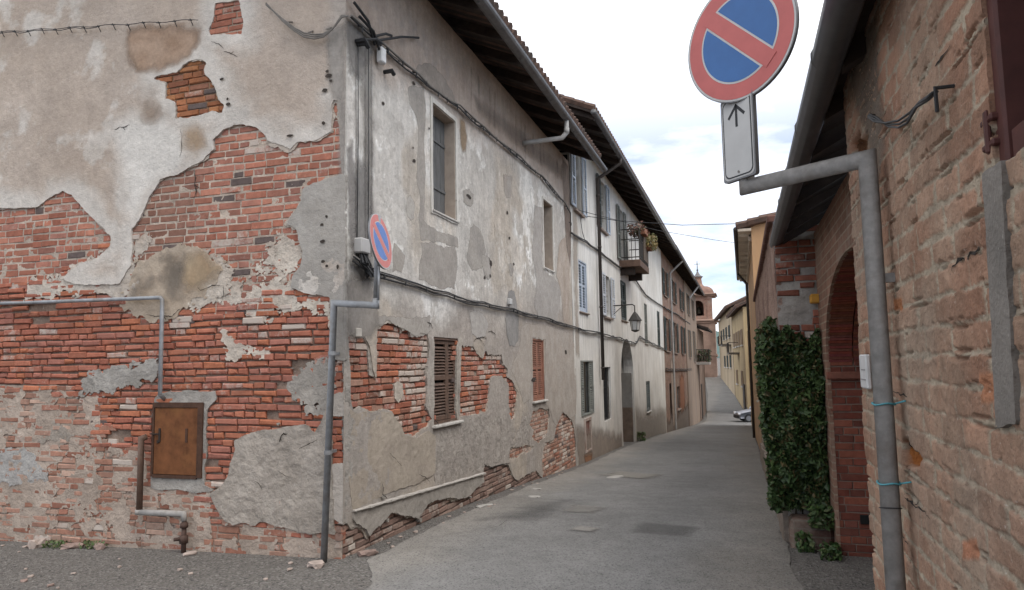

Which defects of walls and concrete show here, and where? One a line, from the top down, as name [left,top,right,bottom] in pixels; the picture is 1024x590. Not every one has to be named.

spalling [210,1,243,35]
spalling [156,61,230,118]
leakage [165,254,218,296]
spalling [0,103,577,559]